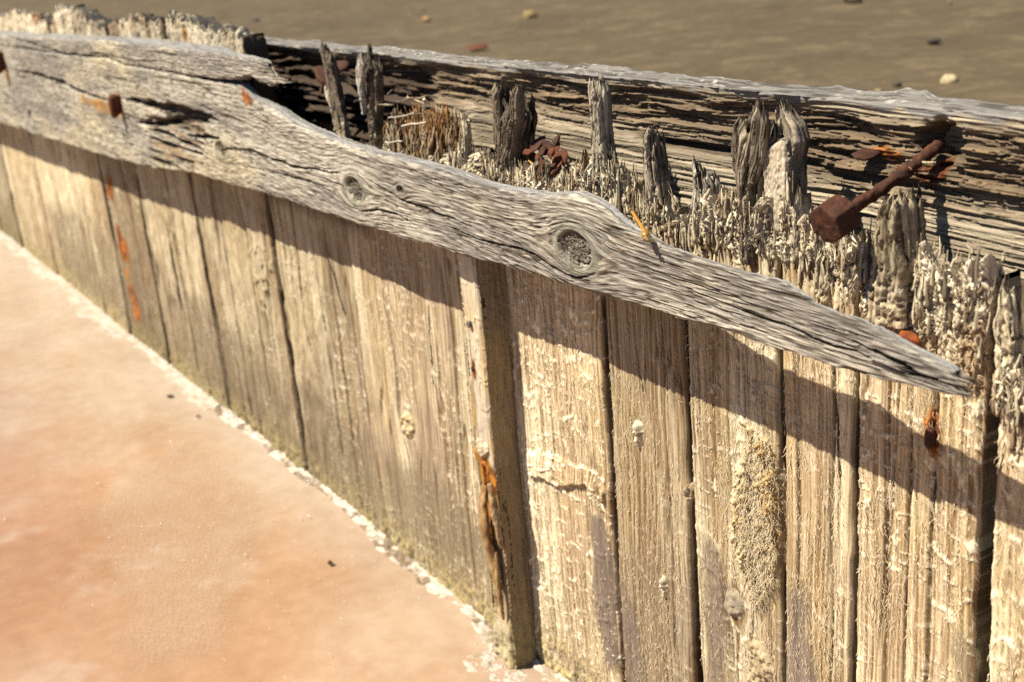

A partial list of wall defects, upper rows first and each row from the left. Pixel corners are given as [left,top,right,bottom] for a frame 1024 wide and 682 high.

crack [127,98,322,185]
rust [851,147,900,161]
rust [916,158,954,187]
rust [115,224,141,321]
rust [923,406,941,460]
rust [473,447,498,551]